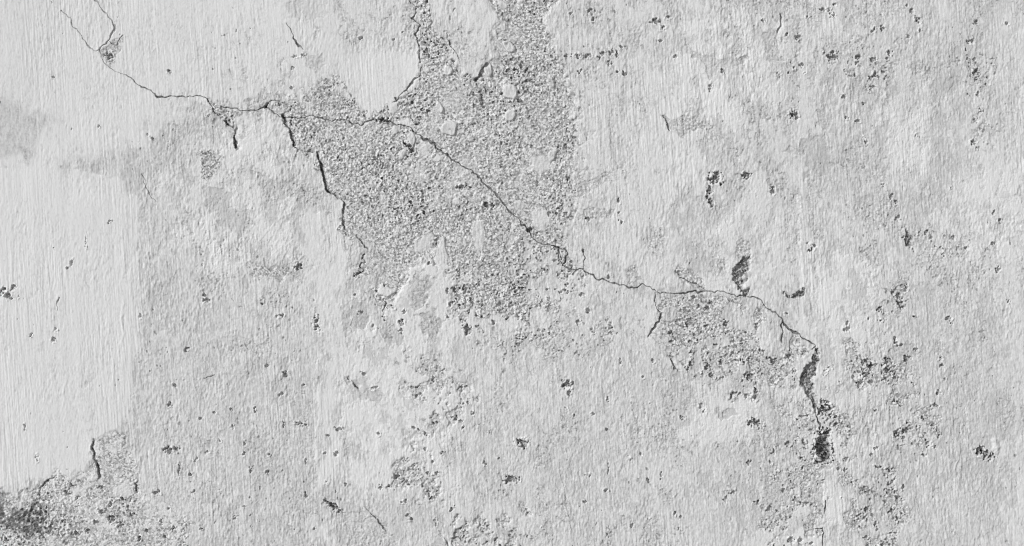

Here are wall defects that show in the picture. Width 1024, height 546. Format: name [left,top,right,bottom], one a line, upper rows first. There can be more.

crack [61,0,818,355]
spalling [275,0,627,370]
spalling [0,430,203,546]
spalling [644,265,946,546]